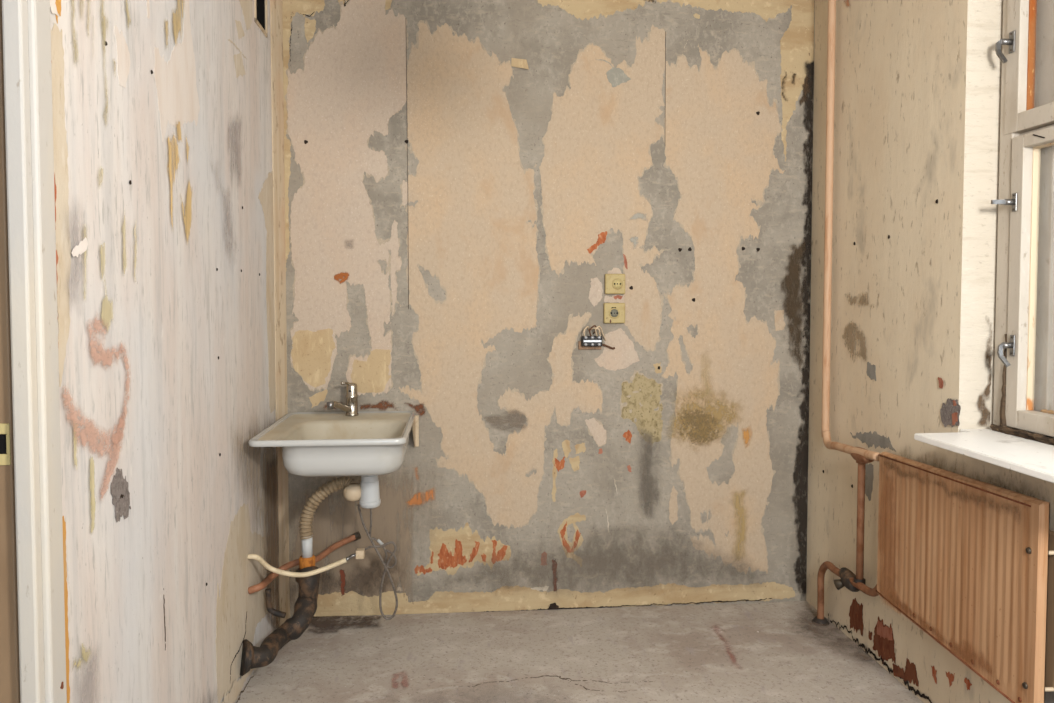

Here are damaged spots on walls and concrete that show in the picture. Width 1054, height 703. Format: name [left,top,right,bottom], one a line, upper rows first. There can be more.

peeling [50,0,71,387]
peeling [587,231,607,254]
peeling [588,254,628,308]
peeling [595,328,639,371]
leakage [782,61,814,594]
leakage [672,393,736,444]
peeling [551,440,603,502]
peeling [414,522,511,576]
peeling [558,513,586,562]
peeling [60,516,90,703]
crack [230,612,254,702]
crack [827,613,932,703]